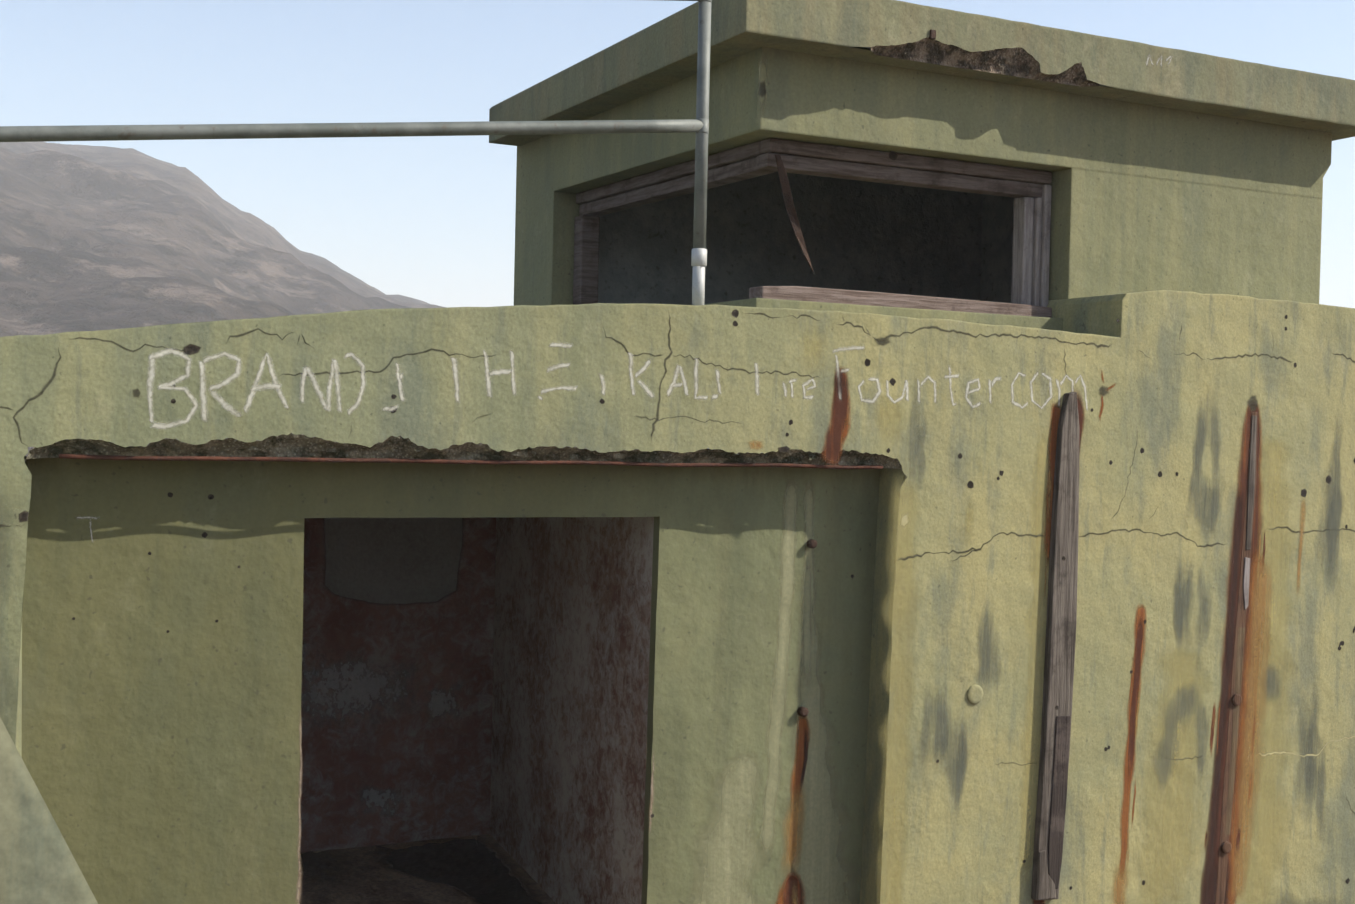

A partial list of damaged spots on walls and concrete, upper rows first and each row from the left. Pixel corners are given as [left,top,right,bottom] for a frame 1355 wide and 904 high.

spalling [871,29,1099,87]
crack [0,337,184,444]
spalling [25,420,903,472]
crack [605,316,817,437]
rust [823,369,850,464]
crack [744,313,1109,375]
crack [902,532,1042,561]
rust [1045,405,1061,587]
crack [1141,327,1290,362]
rust [1201,405,1269,904]
rust [1114,606,1146,904]
rust [778,717,809,904]